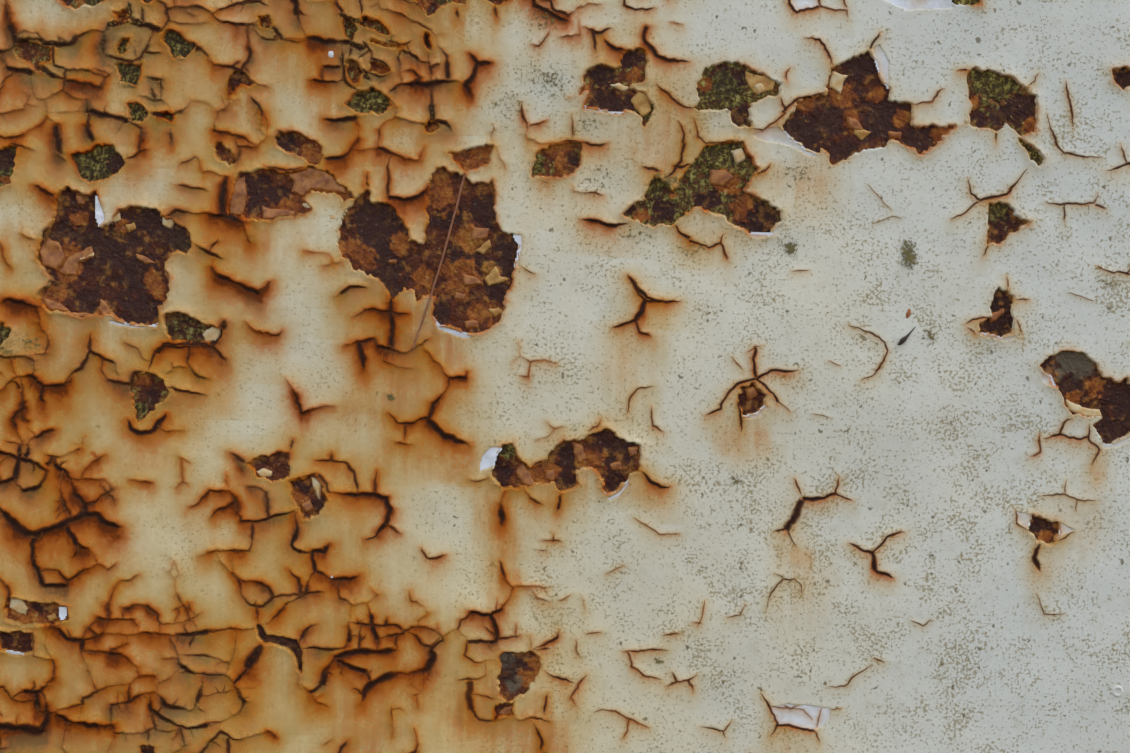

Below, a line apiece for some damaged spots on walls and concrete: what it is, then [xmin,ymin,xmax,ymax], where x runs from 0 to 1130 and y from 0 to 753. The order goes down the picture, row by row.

crack [492,0,680,56]
crack [0,0,497,351]
rust [531,139,609,186]
rust [0,127,522,476]
crack [613,274,680,341]
crack [0,241,569,753]
rust [471,422,672,599]
crack [775,479,851,546]
rust [0,571,183,722]
rust [203,449,426,753]
rust [447,633,585,753]
peeling [762,695,840,741]